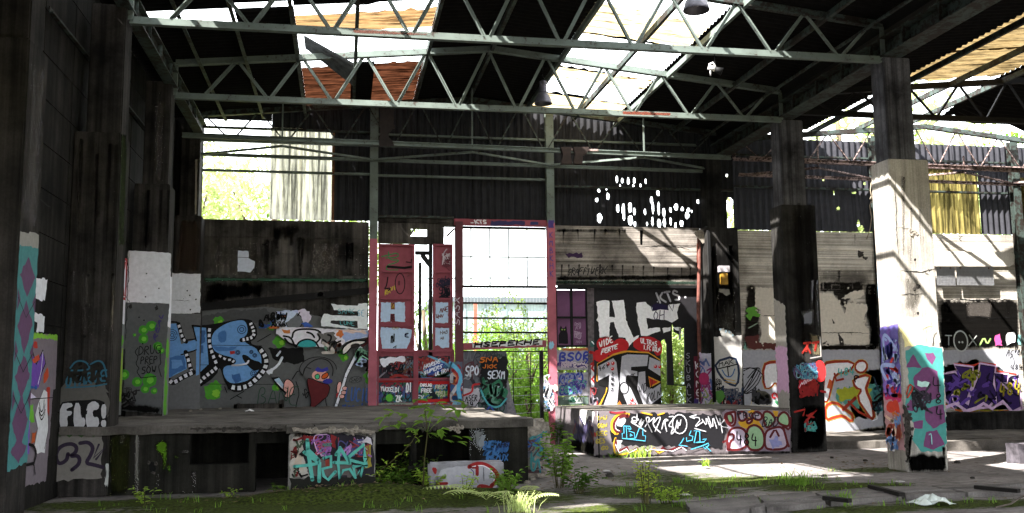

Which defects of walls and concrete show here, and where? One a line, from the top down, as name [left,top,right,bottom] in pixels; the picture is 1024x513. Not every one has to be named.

leakage [215,226,353,275]
peeling [819,287,870,346]